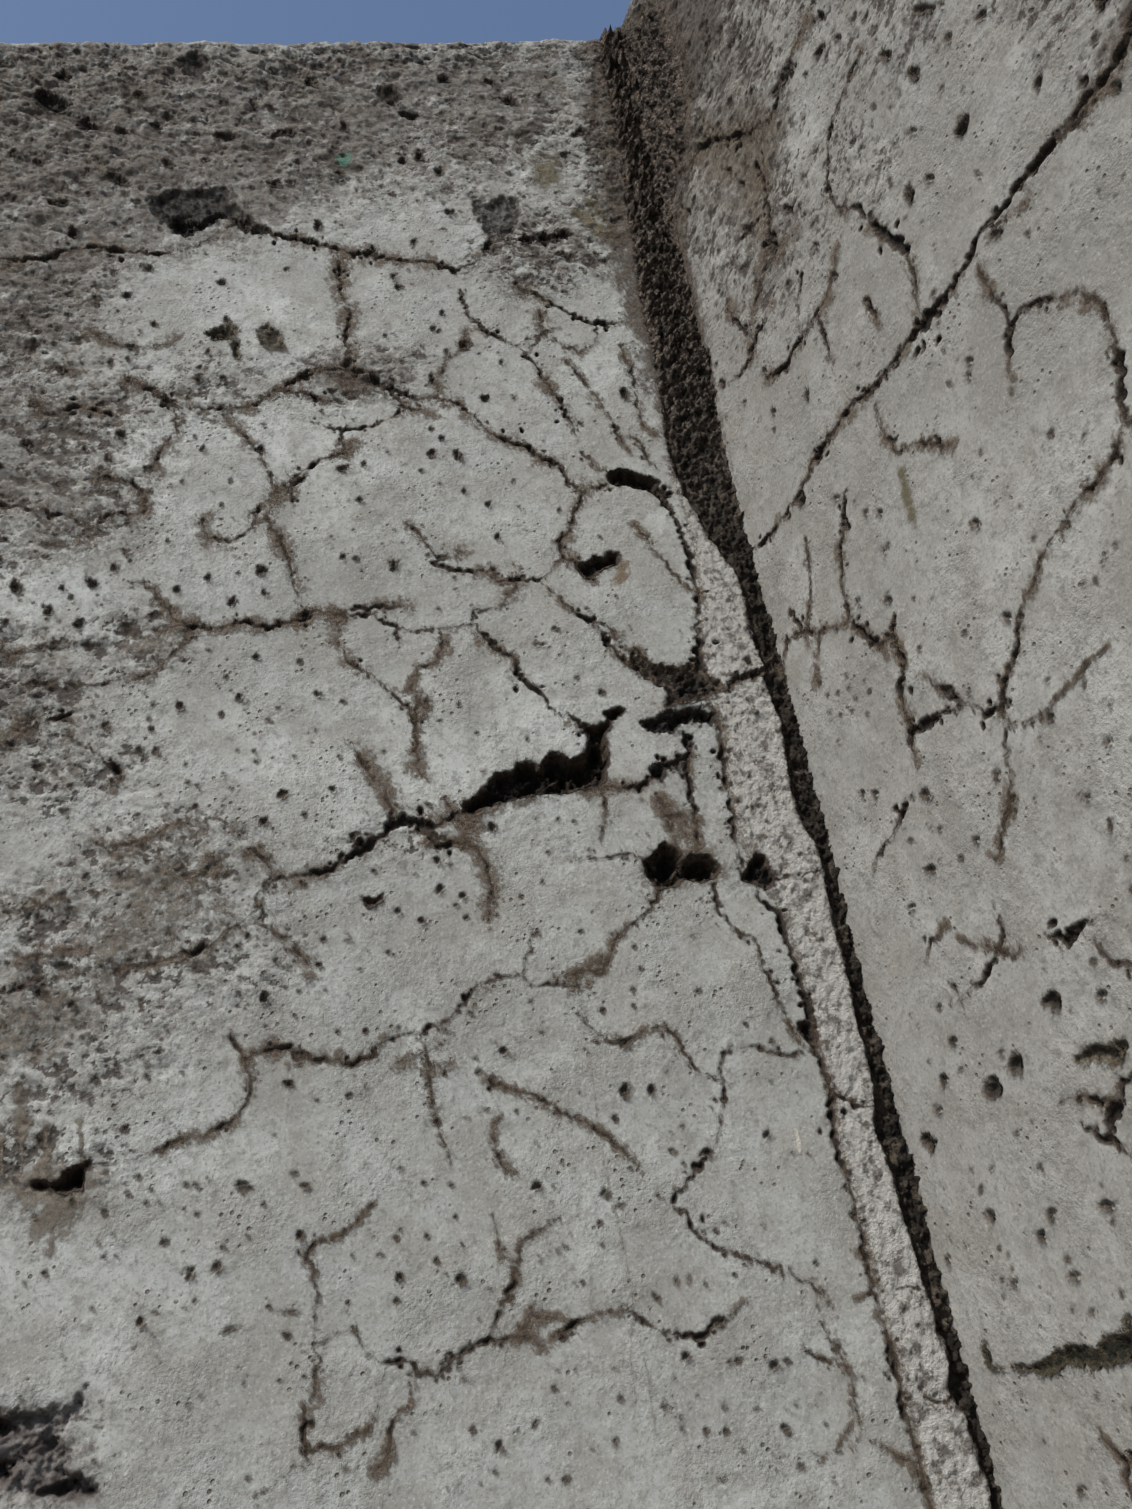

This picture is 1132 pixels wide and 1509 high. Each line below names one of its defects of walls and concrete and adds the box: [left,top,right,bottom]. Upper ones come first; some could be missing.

spalling [165,210,267,238]
crack [691,6,1132,872]
spalling [462,647,766,831]
crack [0,220,955,1509]
spalling [644,841,721,890]
spalling [741,851,777,889]
crack [923,914,1132,1004]
crack [1059,1072,1132,1158]
spalling [0,1415,58,1484]
spalling [32,1472,99,1503]
crack [1098,1426,1132,1498]